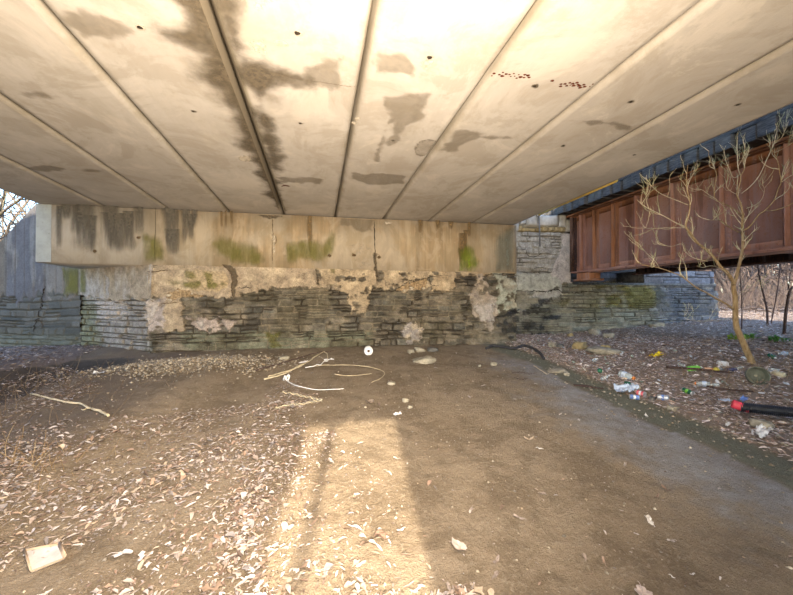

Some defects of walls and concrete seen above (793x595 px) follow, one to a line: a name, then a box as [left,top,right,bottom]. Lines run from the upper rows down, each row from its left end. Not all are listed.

damp [168,0,282,200]
damp [237,62,314,94]
damp [57,204,143,247]
damp [162,207,197,251]
crack [370,224,448,292]
spalling [223,265,238,298]